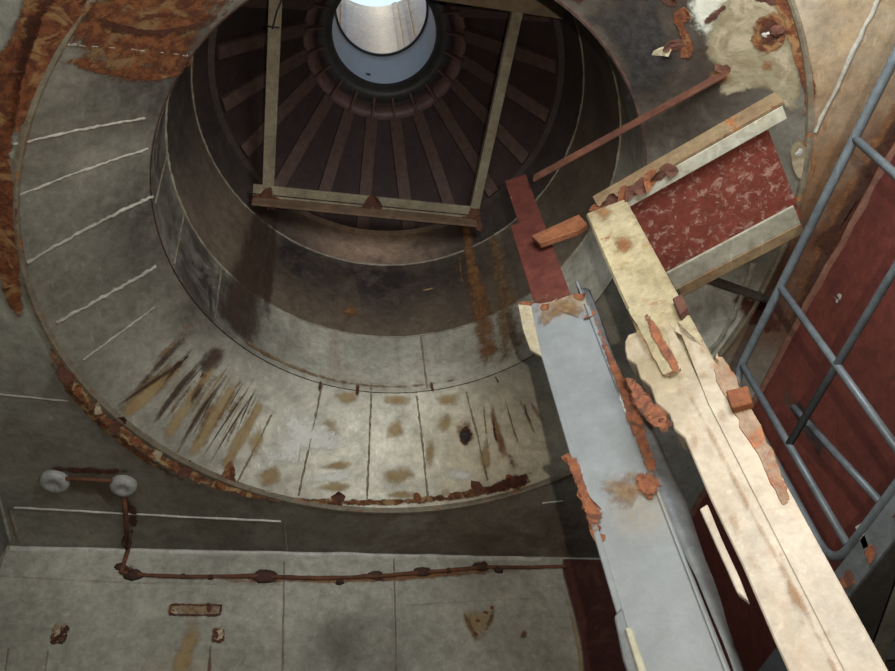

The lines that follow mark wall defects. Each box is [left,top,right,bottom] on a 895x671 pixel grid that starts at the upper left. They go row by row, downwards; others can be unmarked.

peeling [652,0,816,111]
corrosion [0,0,233,316]
corrosion [248,342,434,395]
corrosion [459,227,679,502]
corrosion [51,341,278,501]
leakage [262,411,344,484]
leakage [313,462,352,490]
leakage [389,423,402,436]
leakage [386,470,412,498]
corrosion [289,409,530,506]
leakage [481,445,489,468]